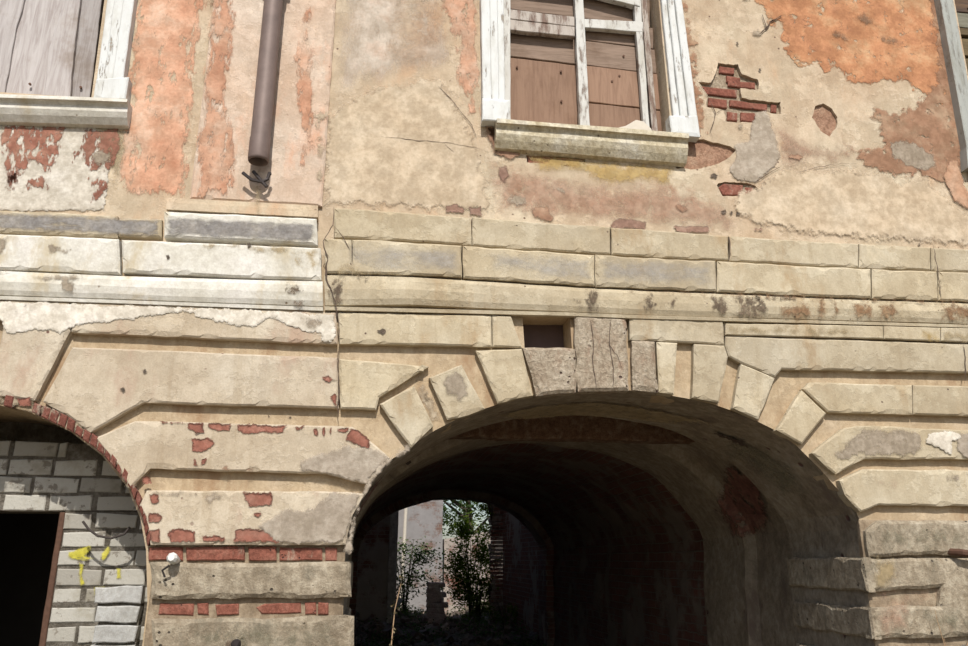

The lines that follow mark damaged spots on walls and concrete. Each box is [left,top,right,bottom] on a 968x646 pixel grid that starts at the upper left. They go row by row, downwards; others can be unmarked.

peeling [72,0,236,203]
peeling [676,0,968,247]
flaking render [1,125,64,190]
peeling [0,275,336,342]
water stain [712,295,792,332]
crack [590,320,621,388]
flaking render [161,415,370,466]
flaking render [0,395,337,561]
flaking render [158,603,239,616]
flaking render [256,602,329,615]